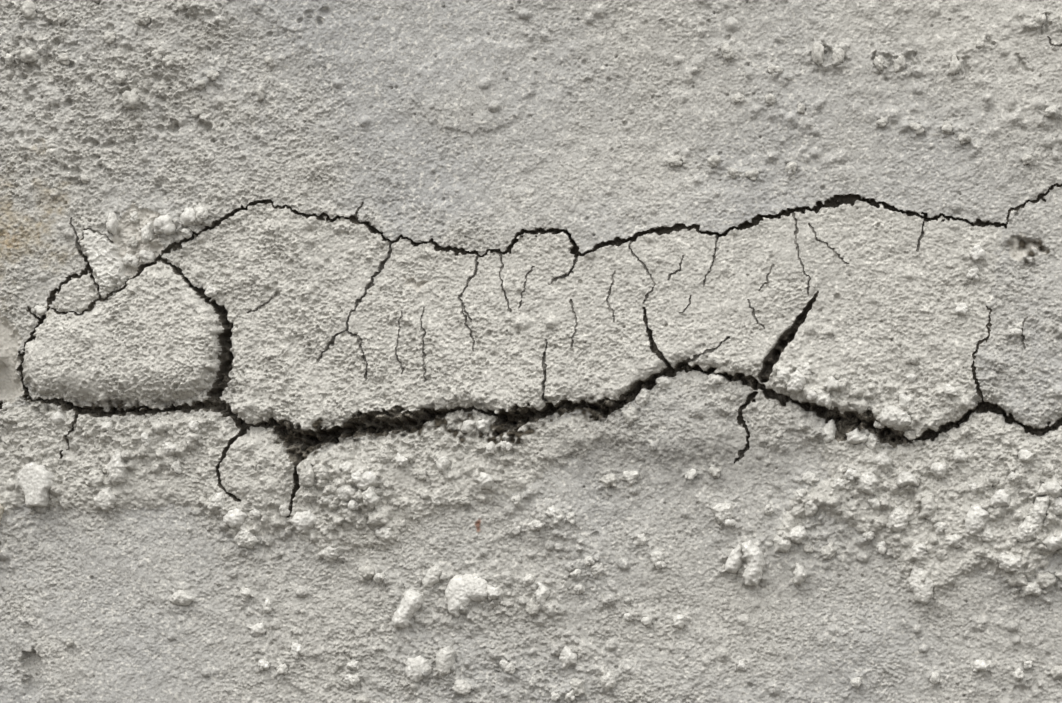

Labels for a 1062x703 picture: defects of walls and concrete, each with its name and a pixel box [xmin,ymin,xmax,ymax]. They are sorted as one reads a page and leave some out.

crack [1047,36,1062,48]
crack [0,183,1062,518]